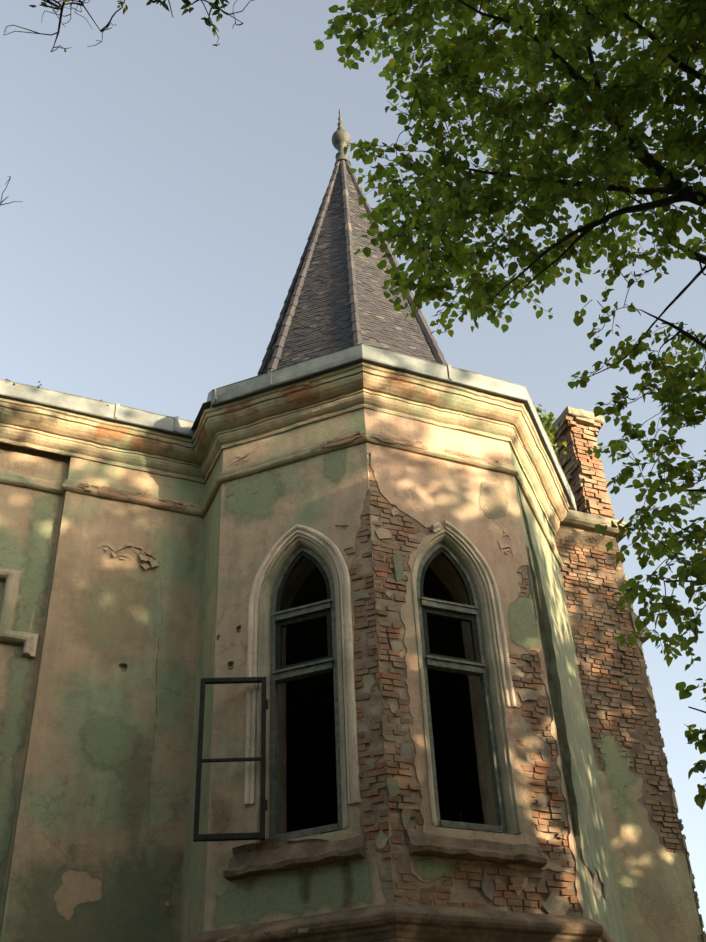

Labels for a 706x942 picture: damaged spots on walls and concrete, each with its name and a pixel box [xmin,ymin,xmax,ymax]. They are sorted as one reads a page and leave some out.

flaking render [232,833,327,856]
flaking render [336,453,582,917]
flaking render [555,525,704,934]